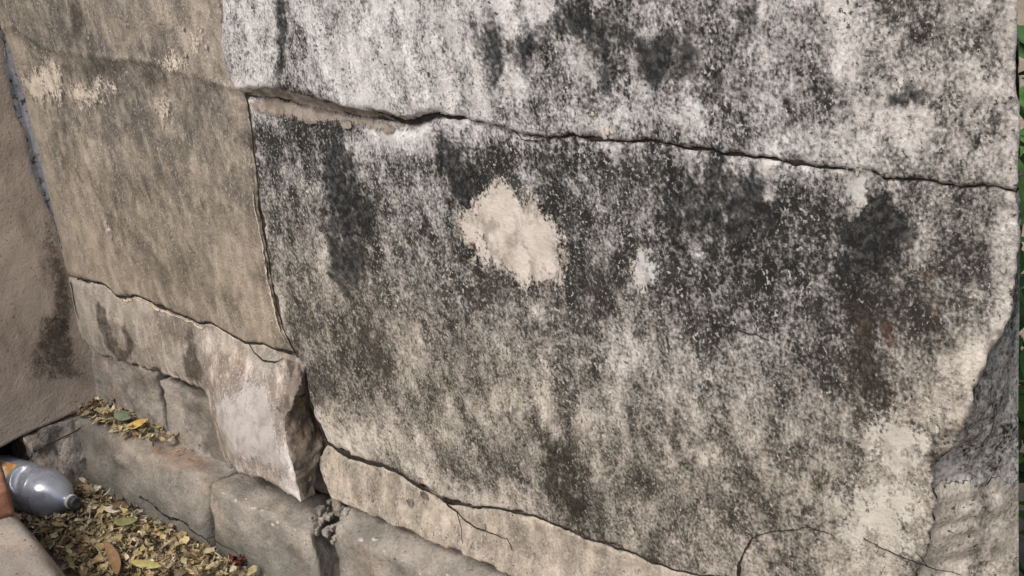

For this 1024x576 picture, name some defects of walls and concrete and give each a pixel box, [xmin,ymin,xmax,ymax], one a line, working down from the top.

leakage [32,205,89,379]
leakage [318,138,376,298]
leakage [434,123,481,216]
crack [70,92,1020,576]
leakage [660,154,780,257]
leakage [826,192,918,403]
crack [21,425,85,463]
leakage [539,432,585,517]